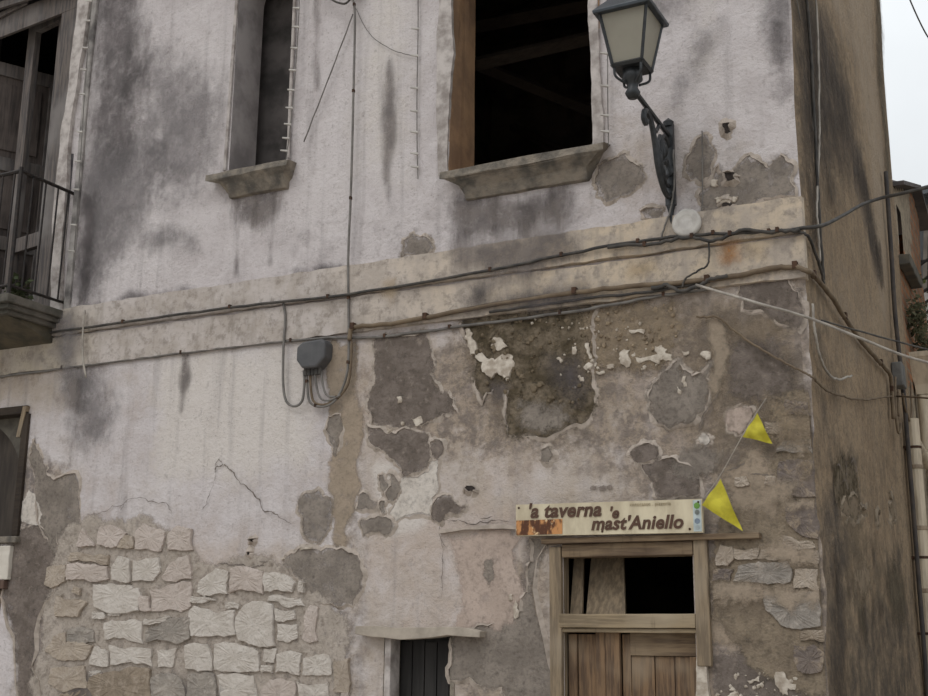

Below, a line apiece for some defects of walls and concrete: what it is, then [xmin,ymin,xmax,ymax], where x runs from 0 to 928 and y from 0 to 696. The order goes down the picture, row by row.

flaking render [591,150,648,206]
flaking render [639,203,666,220]
flaking render [682,117,799,211]
crack [86,497,172,515]
flaking render [0,328,480,696]
crack [203,459,295,524]
flaking render [445,299,826,696]
spalling [833,454,868,528]